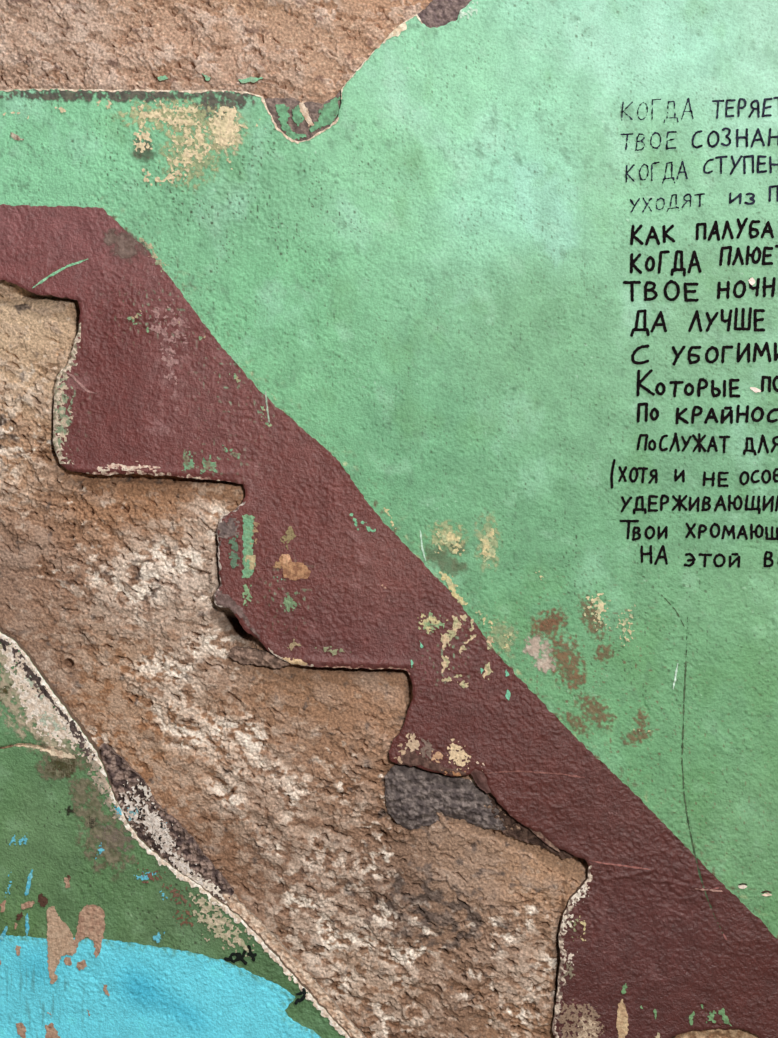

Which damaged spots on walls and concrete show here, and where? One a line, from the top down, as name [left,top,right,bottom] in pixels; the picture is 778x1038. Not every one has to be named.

spalling [0,0,489,189]
spalling [0,281,629,1038]
peeling [583,593,639,647]
peeling [689,1004,732,1026]